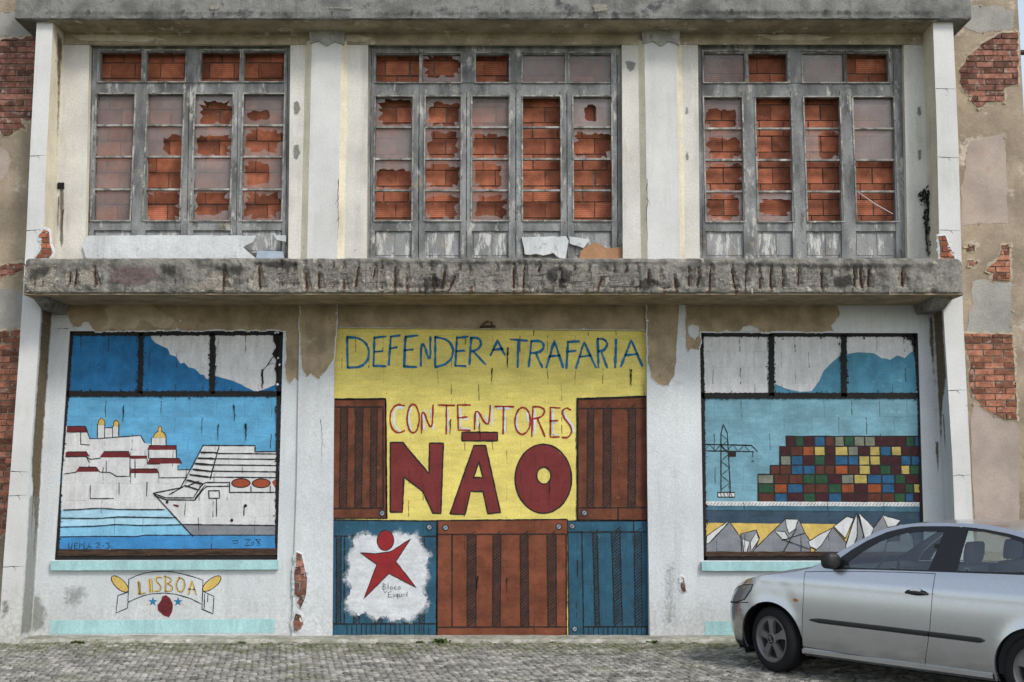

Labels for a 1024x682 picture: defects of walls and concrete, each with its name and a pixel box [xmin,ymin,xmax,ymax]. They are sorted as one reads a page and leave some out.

flaking render [0,34,36,138]
flaking render [957,29,1021,111]
spalling [0,227,100,292]
flaking render [936,234,1014,284]
peeling [67,262,881,387]
flaking render [964,331,1020,422]
flaking render [0,327,21,539]
flaking render [290,550,311,633]